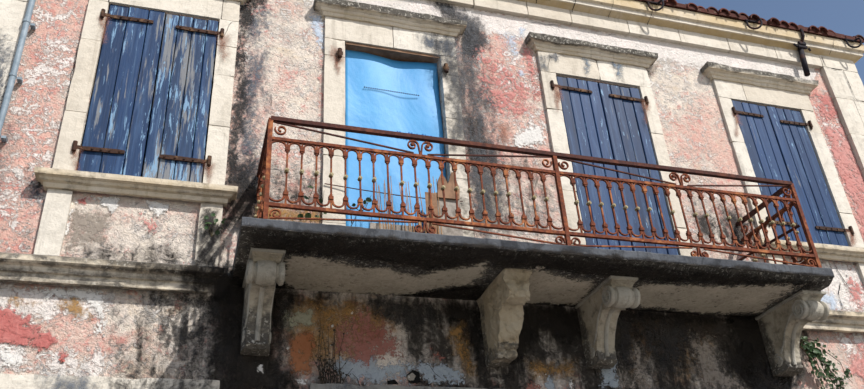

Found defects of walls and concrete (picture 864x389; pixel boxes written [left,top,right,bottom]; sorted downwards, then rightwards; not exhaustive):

water stain [226,0,271,194]
water stain [246,1,822,291]
peeling [65,195,120,248]
peeling [132,199,169,233]
corrosion [268,207,322,223]
peeling [0,285,108,369]
water stain [43,368,95,389]
water stain [108,208,304,389]
flaking render [284,255,489,386]
water stain [370,284,485,353]
water stain [510,303,582,373]
water stain [616,308,798,389]